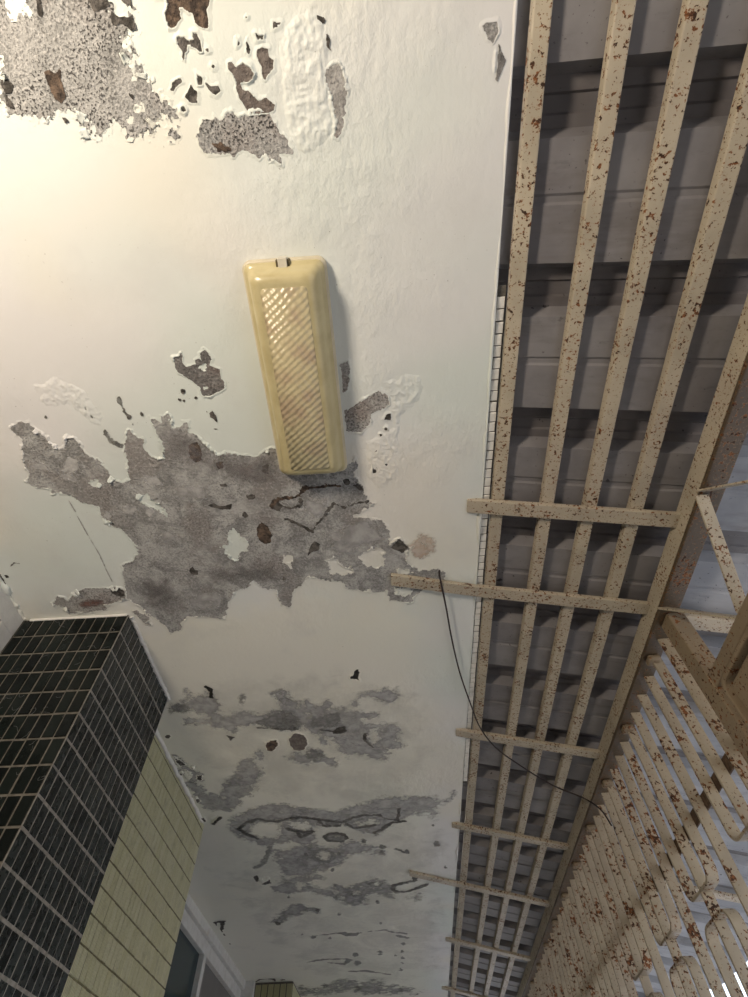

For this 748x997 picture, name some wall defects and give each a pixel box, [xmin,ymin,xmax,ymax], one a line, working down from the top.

peeling [0,0,298,169]
peeling [170,346,227,430]
peeling [338,358,392,438]
peeling [9,411,448,635]
damp [169,685,401,766]
damp [229,790,455,925]